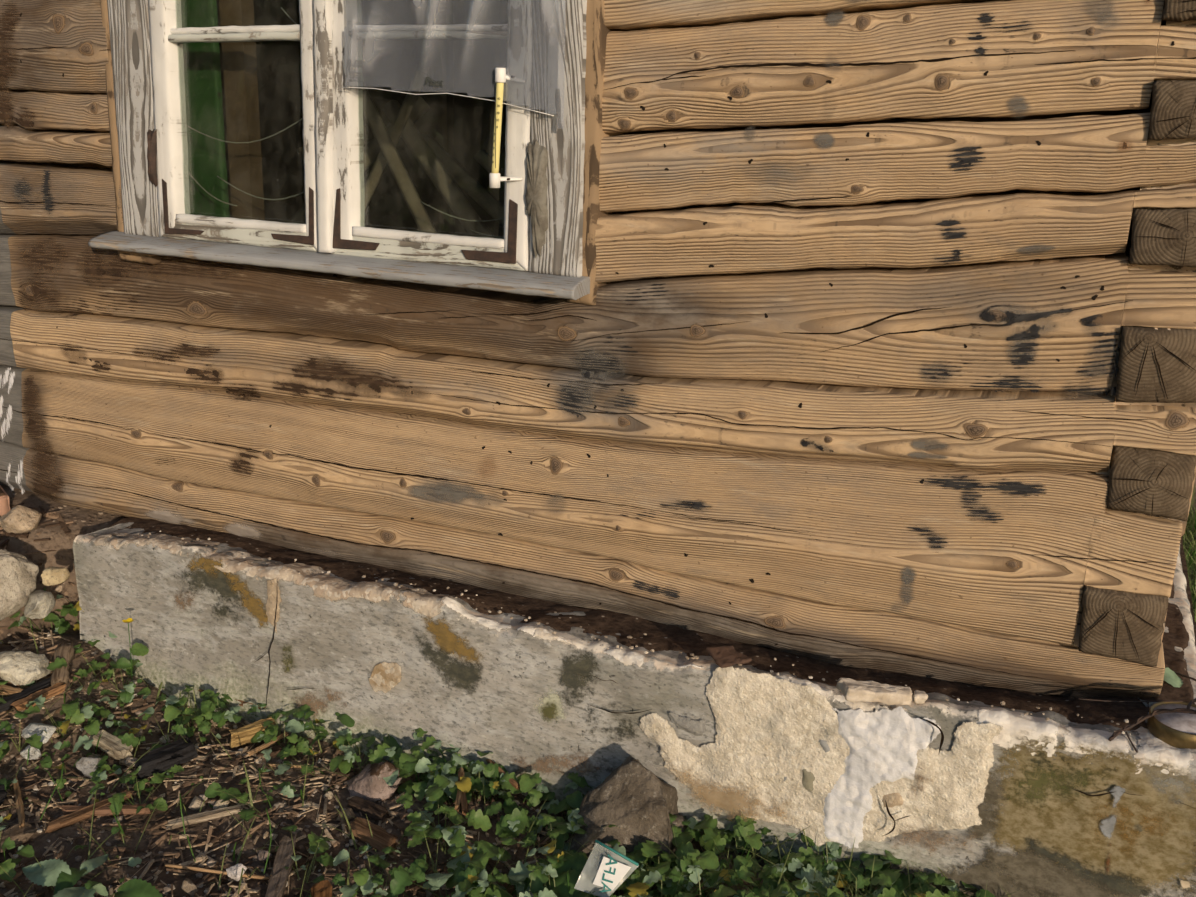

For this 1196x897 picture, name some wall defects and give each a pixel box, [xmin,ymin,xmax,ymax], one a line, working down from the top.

crack [363,307,749,341]
crack [783,307,1004,352]
peeling [265,578,282,633]
leakage [89,511,645,740]
crack [51,481,1100,705]
crack [590,705,652,714]
spalling [639,666,1003,849]
leakage [880,707,1196,897]